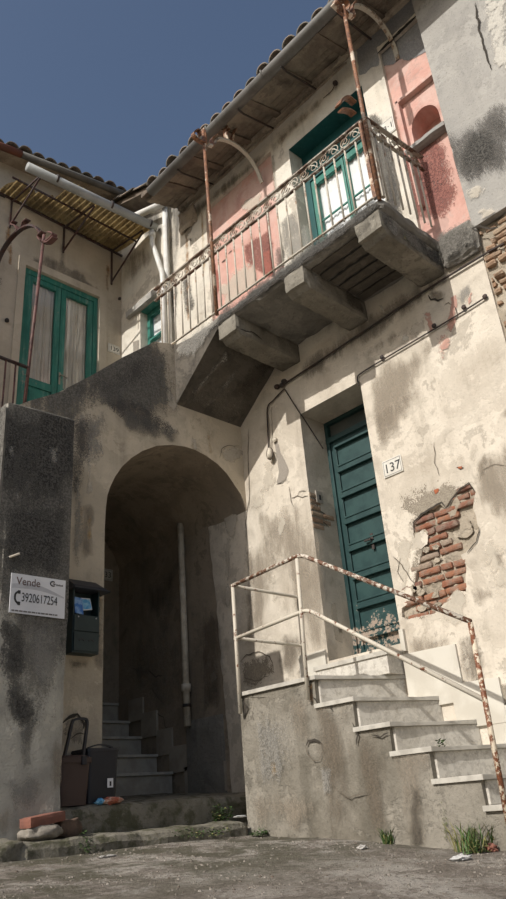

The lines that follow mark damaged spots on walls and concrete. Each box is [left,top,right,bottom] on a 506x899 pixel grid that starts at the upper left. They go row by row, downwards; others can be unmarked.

damp [404,103,506,220]
damp [0,114,474,760]
spalling [309,492,334,530]
spalling [395,482,479,625]
damp [406,758,420,843]